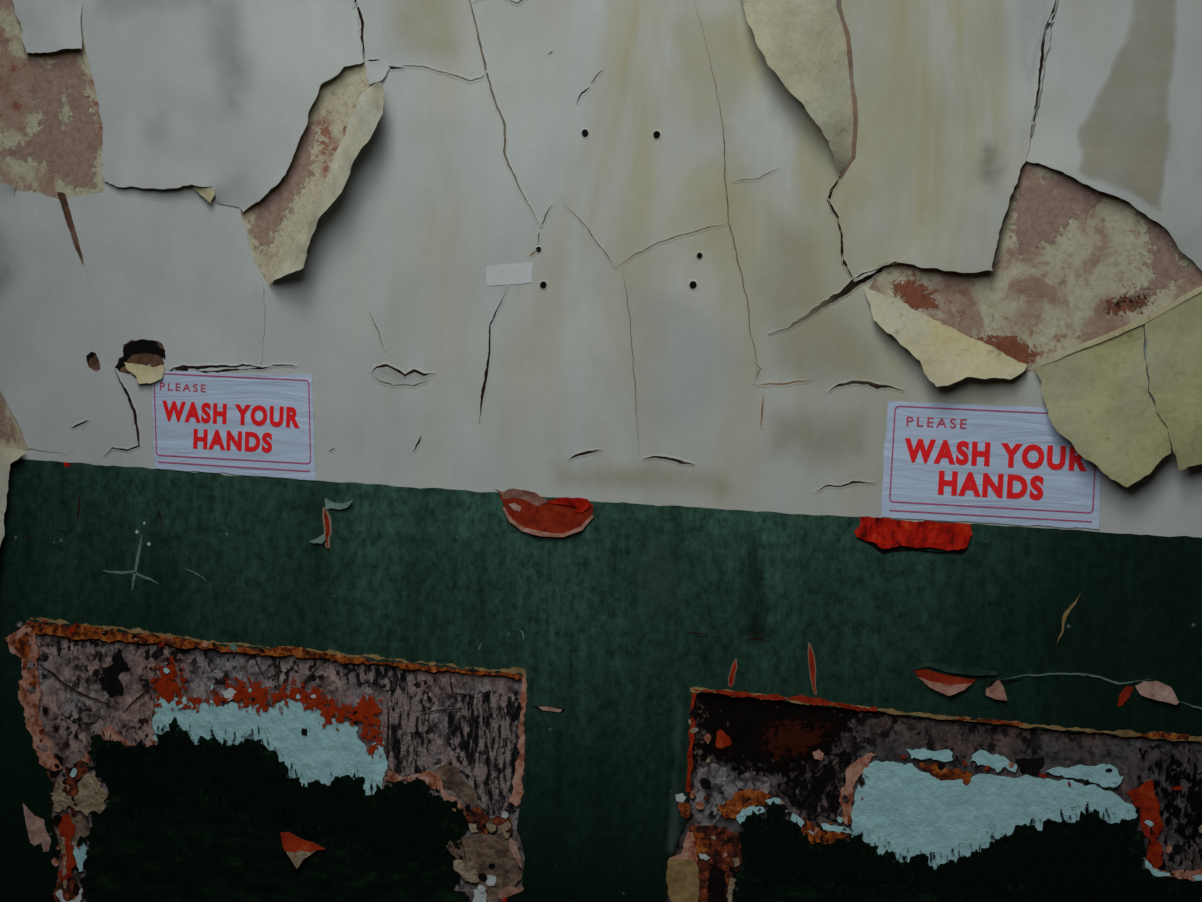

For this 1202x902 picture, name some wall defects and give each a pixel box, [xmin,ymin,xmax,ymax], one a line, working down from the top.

crack [1028,0,1059,136]
peeling [0,0,390,545]
crack [351,0,905,467]
peeling [742,0,1202,487]
crack [70,418,91,430]
crack [103,368,142,458]
crack [166,362,299,374]
spalling [496,489,595,537]
crack [814,479,876,494]
spalling [854,516,972,555]
flaking render [5,617,565,902]
flaking render [666,687,1202,902]